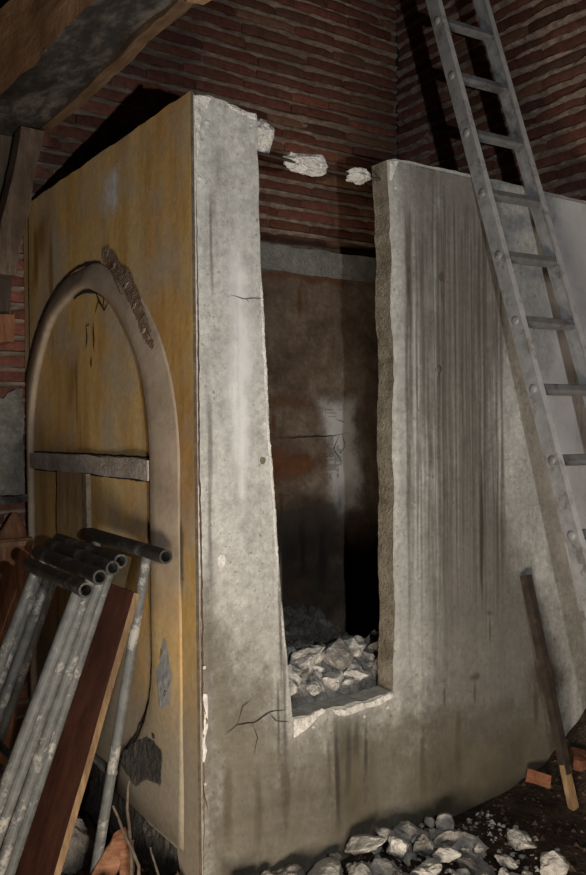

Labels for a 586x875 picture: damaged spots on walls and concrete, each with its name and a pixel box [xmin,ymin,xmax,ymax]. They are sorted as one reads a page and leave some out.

spalling [194,95,211,157]
spalling [227,103,257,127]
crack [196,182,290,847]
water stain [200,168,555,875]